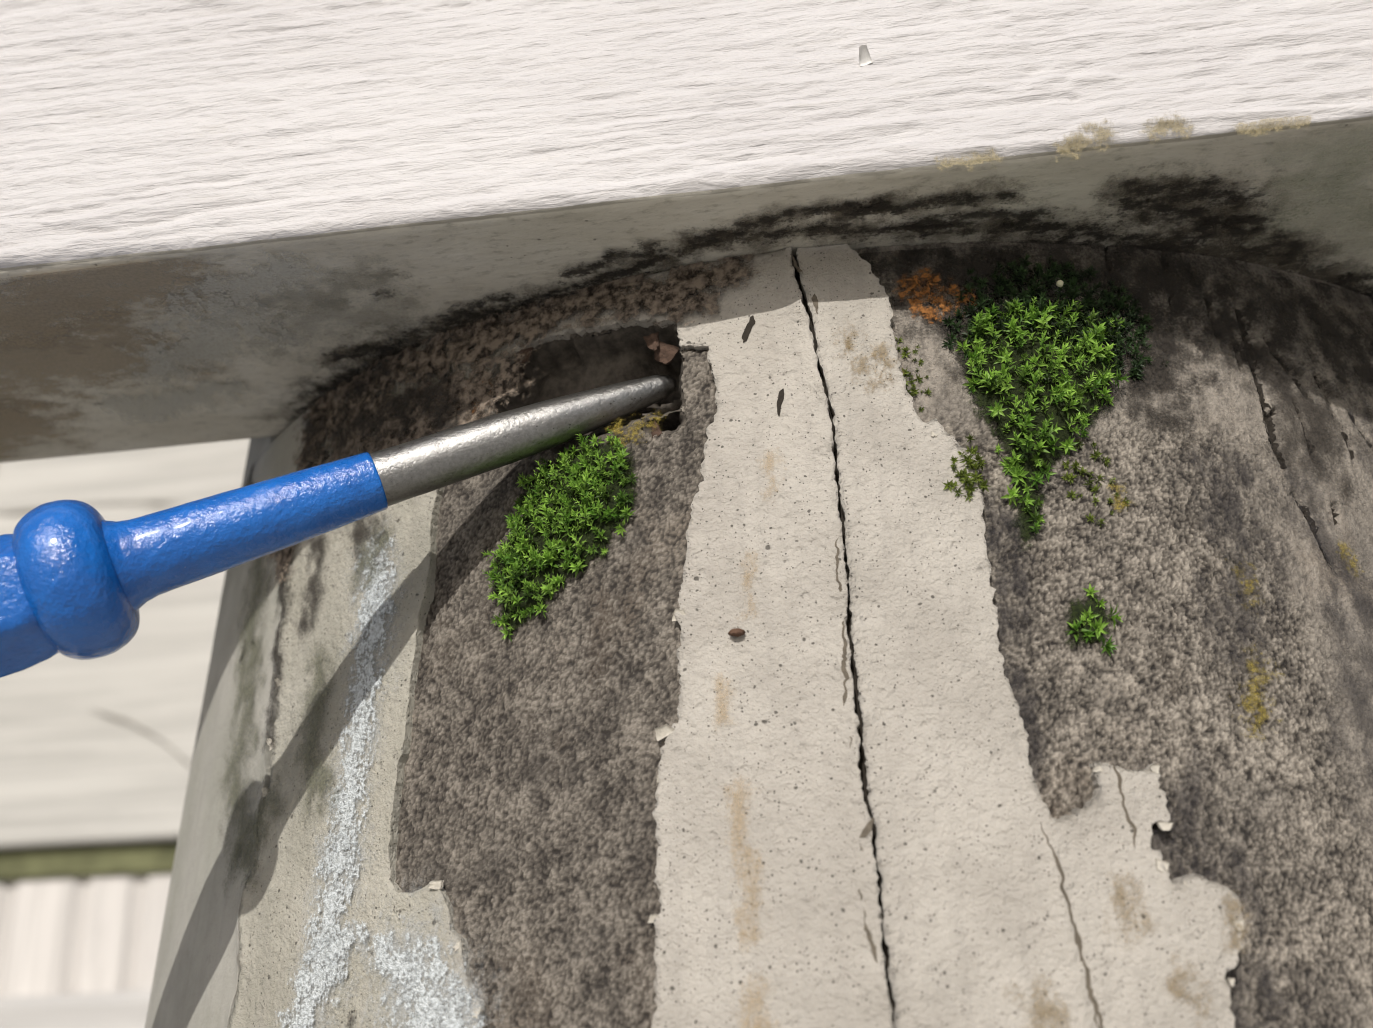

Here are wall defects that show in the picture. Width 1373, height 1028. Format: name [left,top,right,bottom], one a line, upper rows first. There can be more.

water stain [936,149,1001,169]
water stain [0,254,324,459]
crack [776,388,784,416]
water stain [265,171,1373,503]
water stain [262,535,328,749]
water stain [275,515,484,1028]
peeling [395,324,717,1028]
crack [791,255,895,1027]
peeling [855,241,1373,1028]
water stain [1242,660,1270,733]
crack [1040,822,1103,1028]